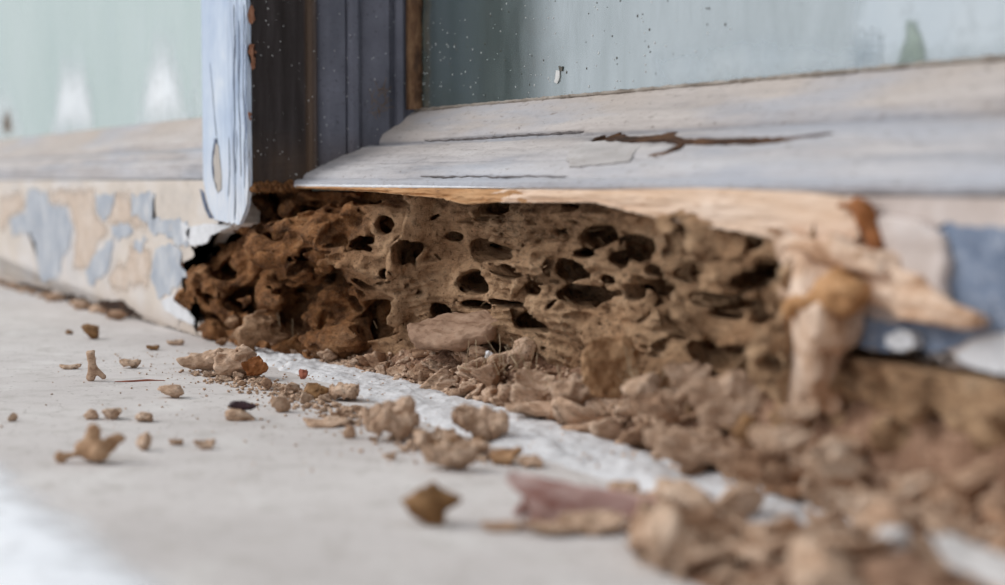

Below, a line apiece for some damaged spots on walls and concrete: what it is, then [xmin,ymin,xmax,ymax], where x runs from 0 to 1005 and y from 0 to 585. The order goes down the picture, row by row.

crack [421,131,834,179]
peeling [0,188,232,325]
peeling [858,222,1005,374]